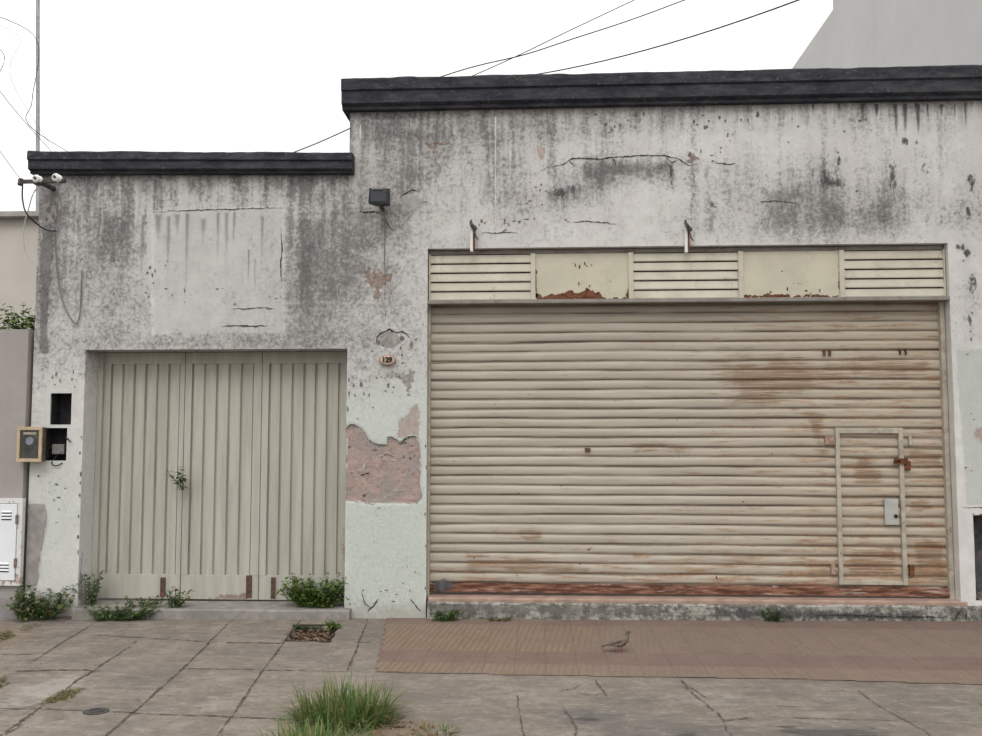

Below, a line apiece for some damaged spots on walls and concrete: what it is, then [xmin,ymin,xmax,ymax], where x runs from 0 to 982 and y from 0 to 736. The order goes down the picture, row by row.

leakage [893,103,929,145]
crack [541,154,735,171]
leakage [812,151,858,192]
leakage [39,225,54,353]
corrosion [535,270,629,299]
spalling [345,328,427,516]